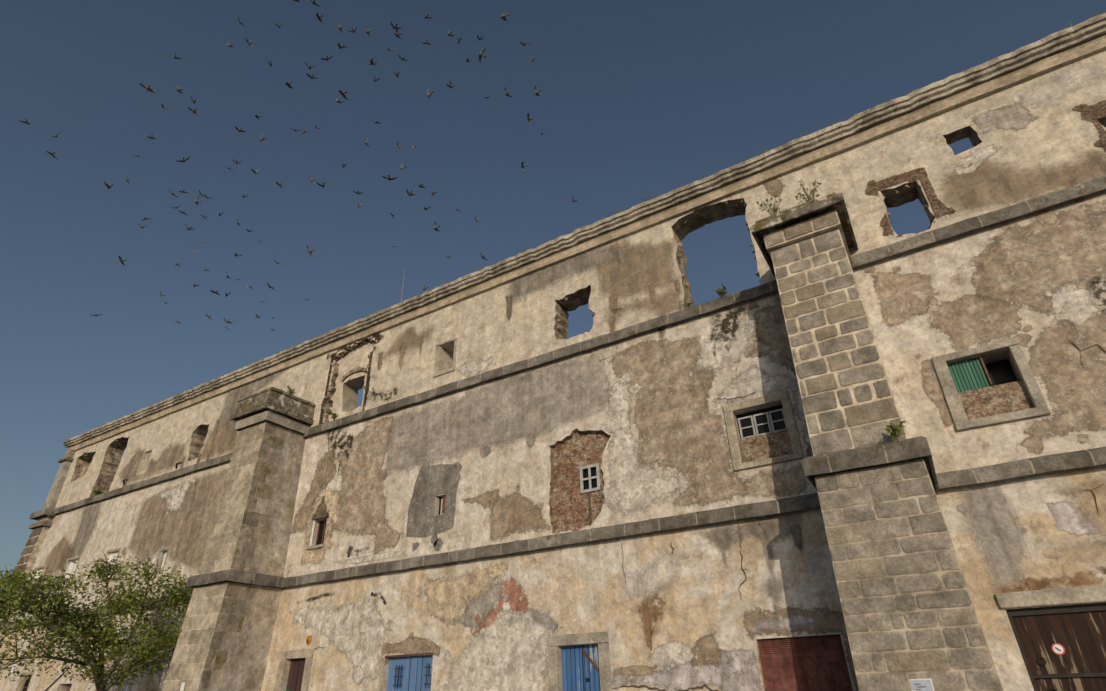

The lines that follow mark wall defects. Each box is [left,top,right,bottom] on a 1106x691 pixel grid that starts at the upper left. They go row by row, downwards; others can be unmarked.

peeling [954,63,1106,175]
spalling [865,167,955,233]
peeling [865,200,1106,454]
peeling [291,299,813,565]
crack [738,520,766,601]
peeling [292,560,562,691]
peeling [611,604,859,691]